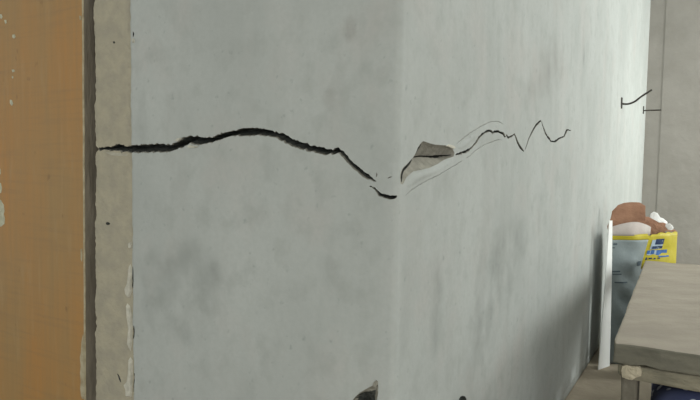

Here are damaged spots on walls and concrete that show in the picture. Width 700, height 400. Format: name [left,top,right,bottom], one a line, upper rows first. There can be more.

crack [99,120,571,200]
spalling [400,141,456,184]